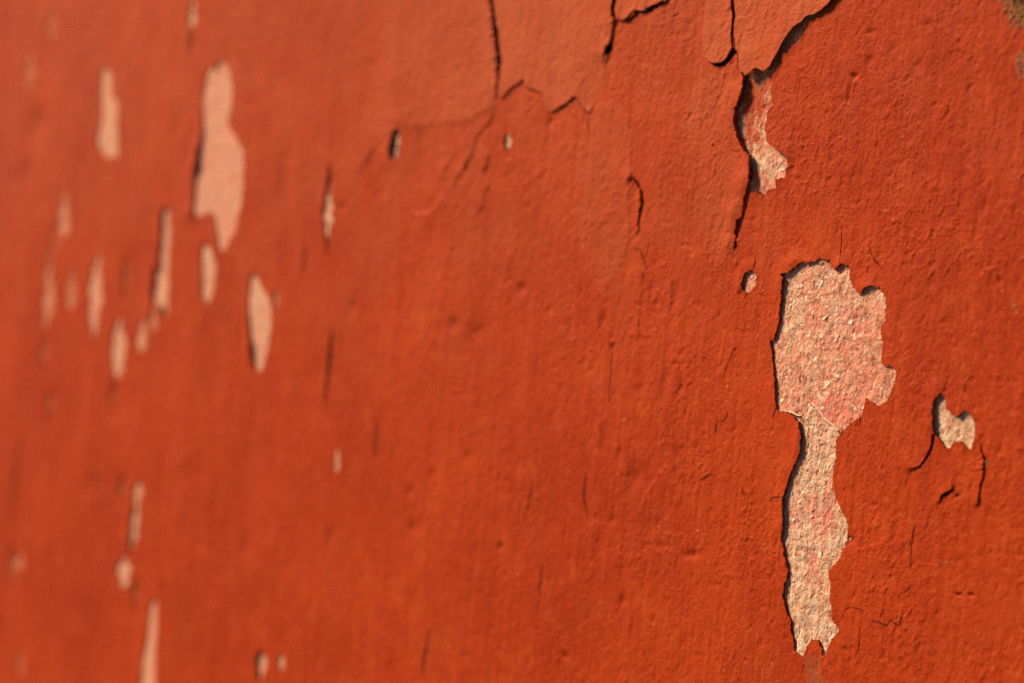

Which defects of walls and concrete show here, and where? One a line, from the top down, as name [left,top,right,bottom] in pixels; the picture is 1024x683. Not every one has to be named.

peeling [96,66,118,160]
crack [489,0,589,133]
crack [603,1,678,60]
peeling [702,0,834,251]
peeling [191,61,244,304]
crack [631,177,647,280]
peeling [110,207,170,380]
peeling [247,273,278,372]
peeling [770,257,896,657]
crack [912,434,938,469]
peeling [931,392,975,449]
crack [939,443,987,504]